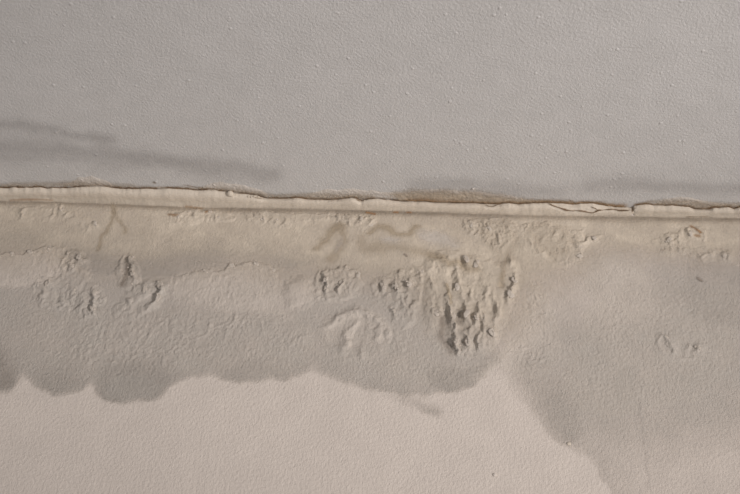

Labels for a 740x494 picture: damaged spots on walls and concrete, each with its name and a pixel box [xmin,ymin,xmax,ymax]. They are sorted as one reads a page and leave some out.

crack [0,183,86,191]
crack [106,185,740,217]
leakage [0,191,740,402]
leakage [542,266,740,436]